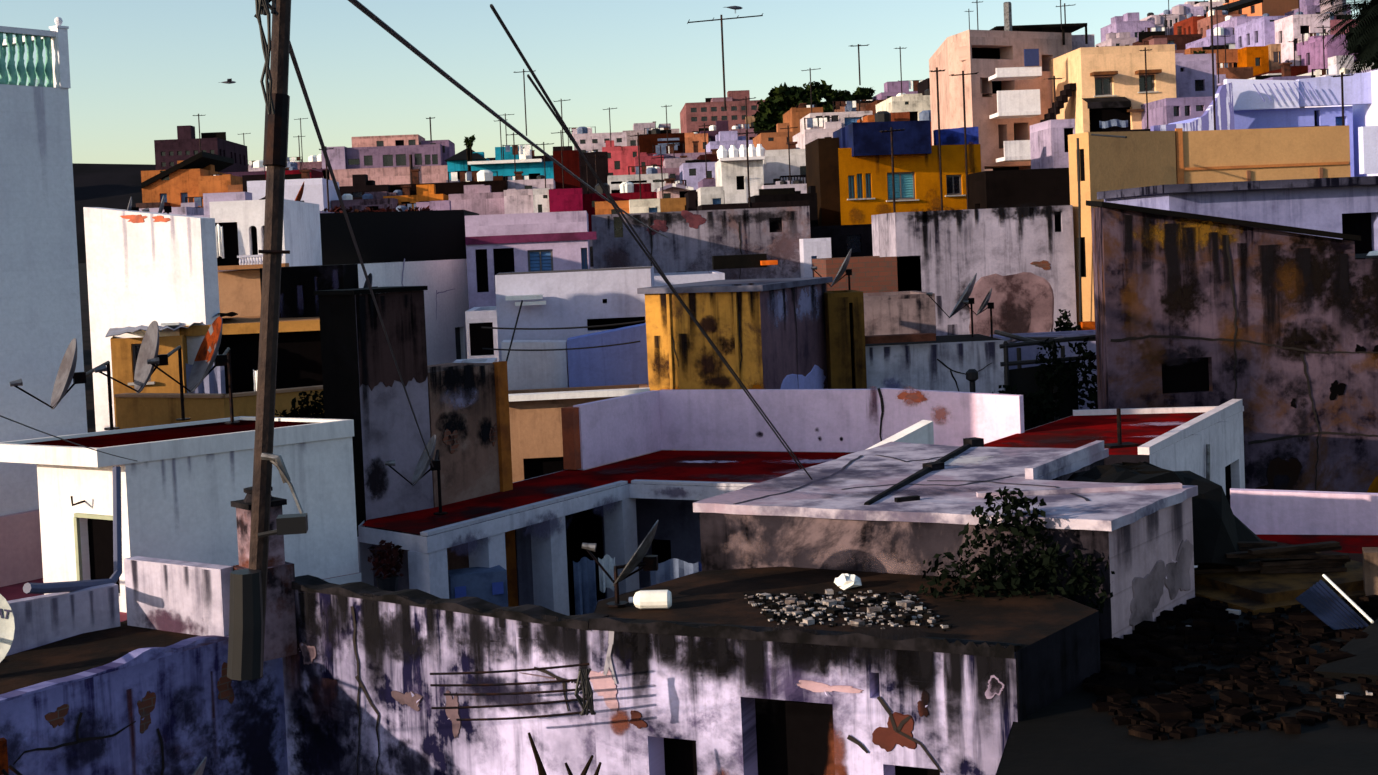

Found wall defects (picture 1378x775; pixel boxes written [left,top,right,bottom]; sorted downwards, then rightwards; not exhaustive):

damp [909,193,1062,259]
damp [653,210,827,389]
damp [1124,215,1378,361]
damp [430,363,493,450]
peeling [897,389,947,423]
damp [145,610,202,635]
flaking render [45,704,69,728]
flaking render [137,691,156,734]
flaking render [217,662,235,705]
damp [225,590,589,775]
damp [612,624,1017,737]
flaking render [872,692,928,752]